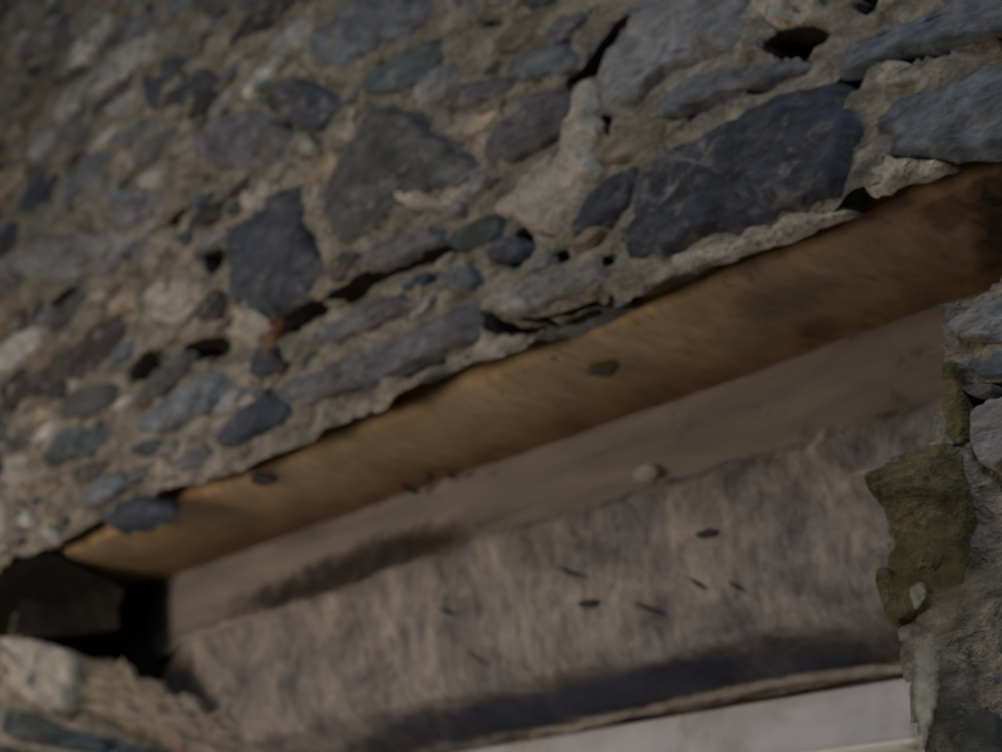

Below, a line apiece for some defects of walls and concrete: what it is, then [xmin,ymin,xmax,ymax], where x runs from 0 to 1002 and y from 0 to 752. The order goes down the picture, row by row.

spalling [0,549,172,681]
leakage [349,637,868,752]